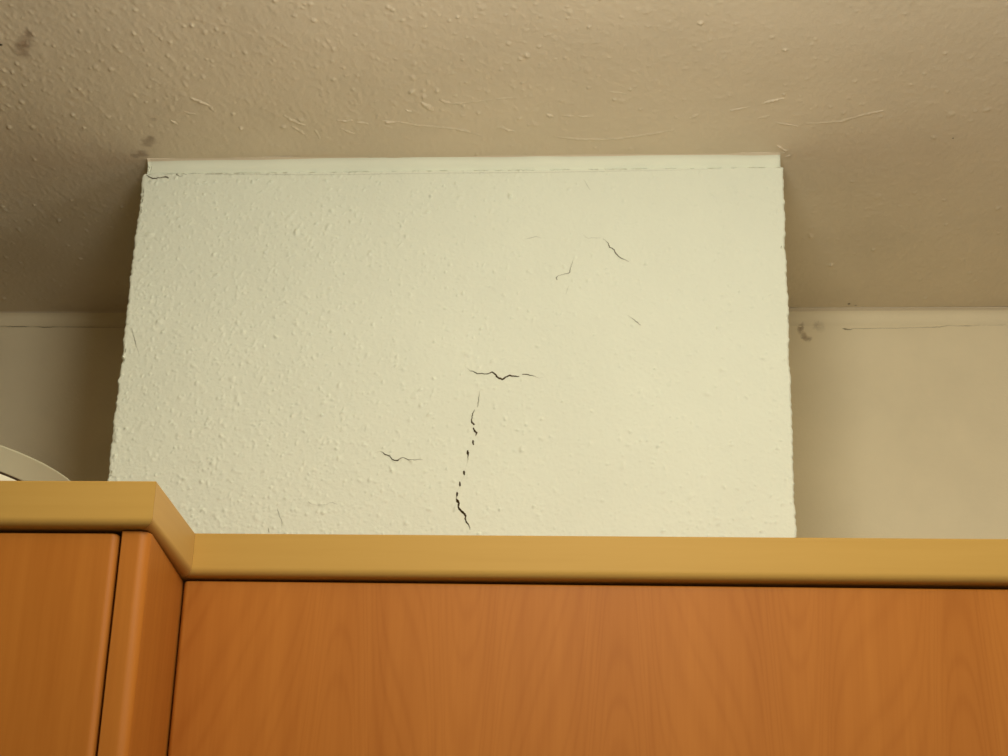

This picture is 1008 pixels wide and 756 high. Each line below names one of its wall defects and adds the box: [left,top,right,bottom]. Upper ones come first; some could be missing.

crack [381,452,414,462]
crack [456,371,535,529]